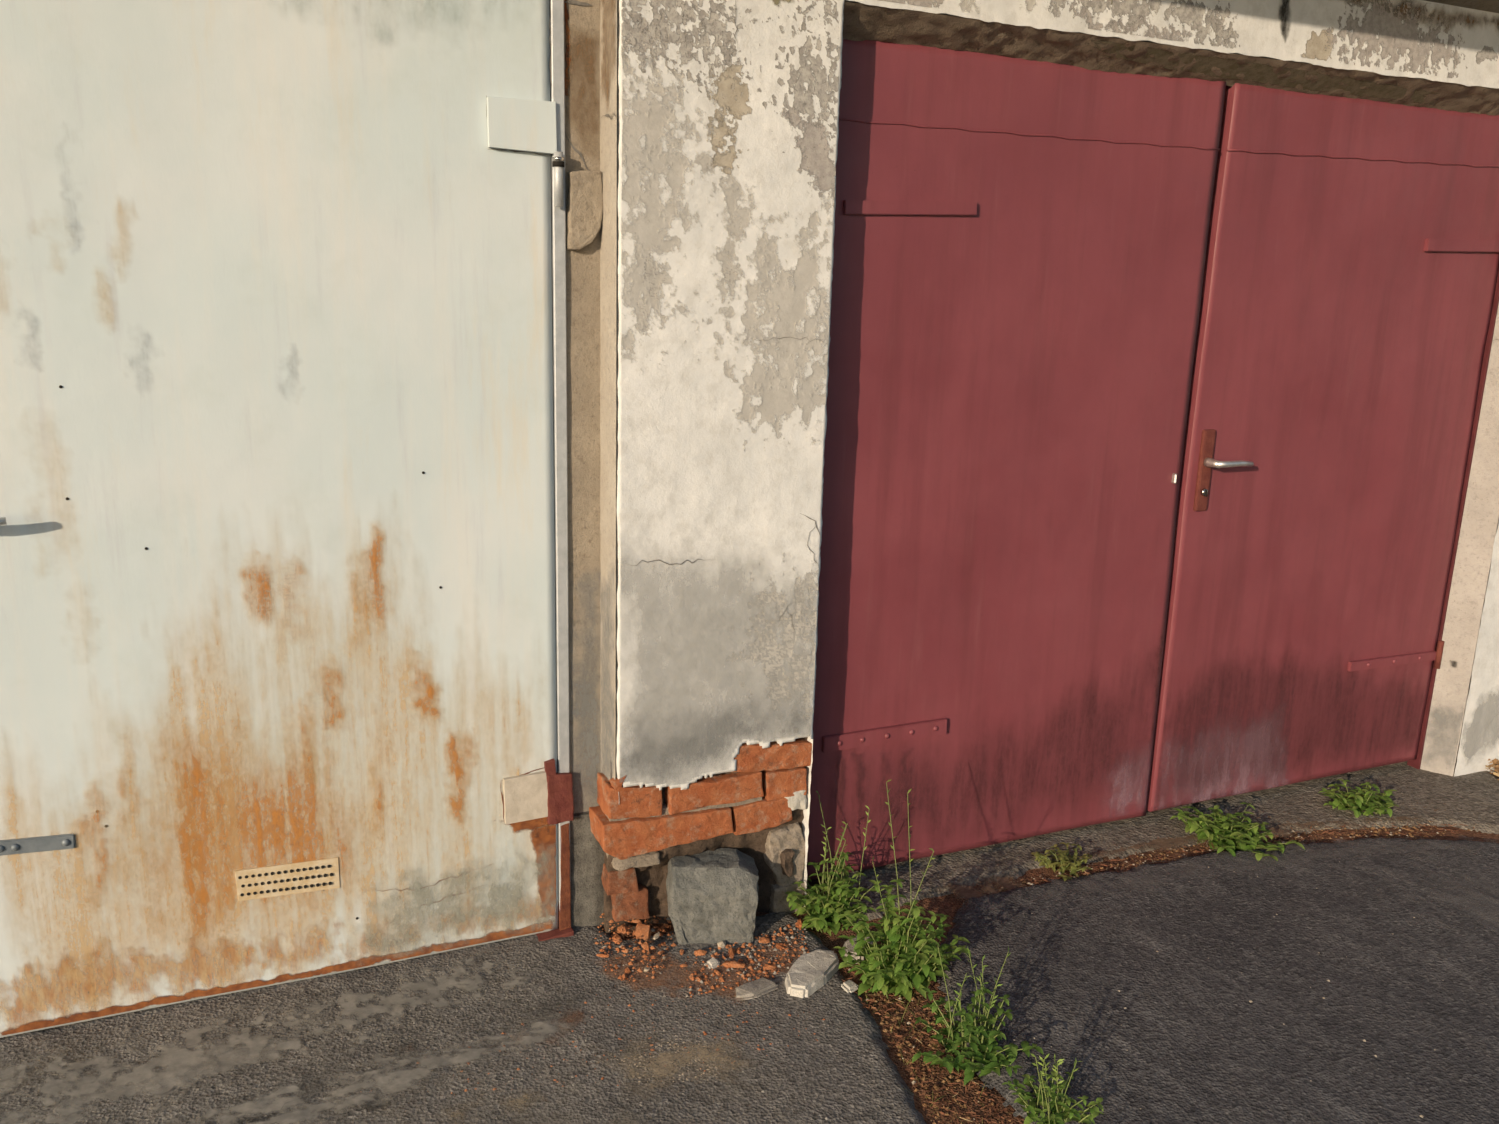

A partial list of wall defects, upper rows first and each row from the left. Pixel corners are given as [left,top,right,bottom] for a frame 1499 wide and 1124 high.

peeling [1026,0,1240,48]
peeling [1302,0,1498,78]
peeling [621,0,840,450]
rust [243,568,271,618]
rust [354,535,384,632]
rust [369,650,438,766]
damp [571,562,814,794]
spalling [589,570,819,934]
damp [1432,694,1499,759]
rust [0,683,571,1036]